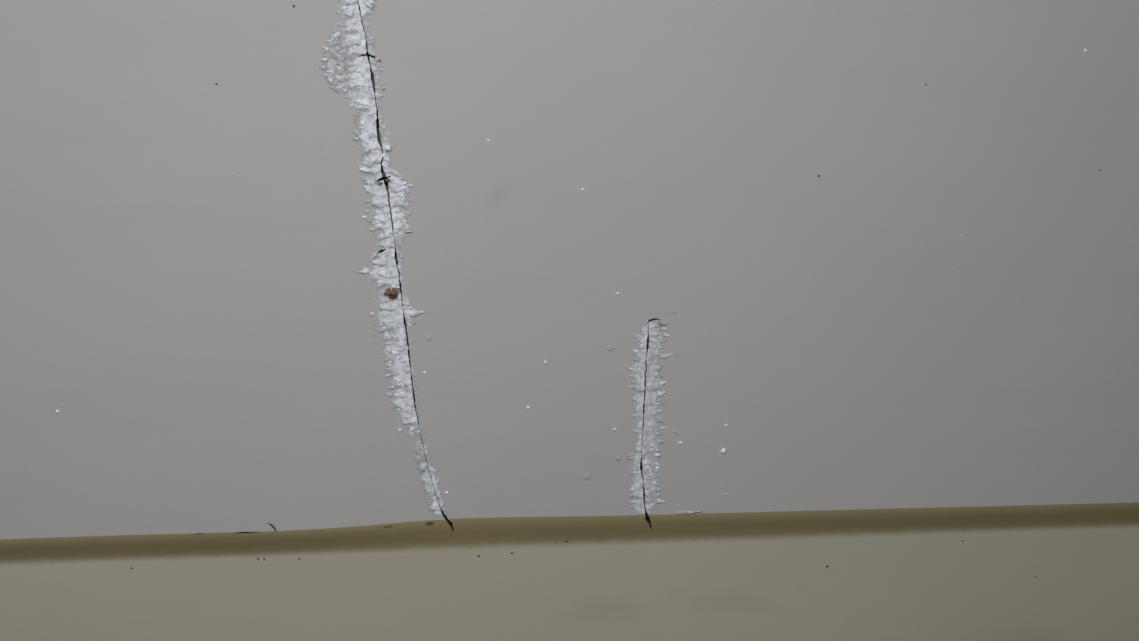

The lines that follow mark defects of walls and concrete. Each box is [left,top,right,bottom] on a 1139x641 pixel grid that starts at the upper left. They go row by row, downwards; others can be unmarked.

crack [358,0,454,531]
crack [640,318,660,530]